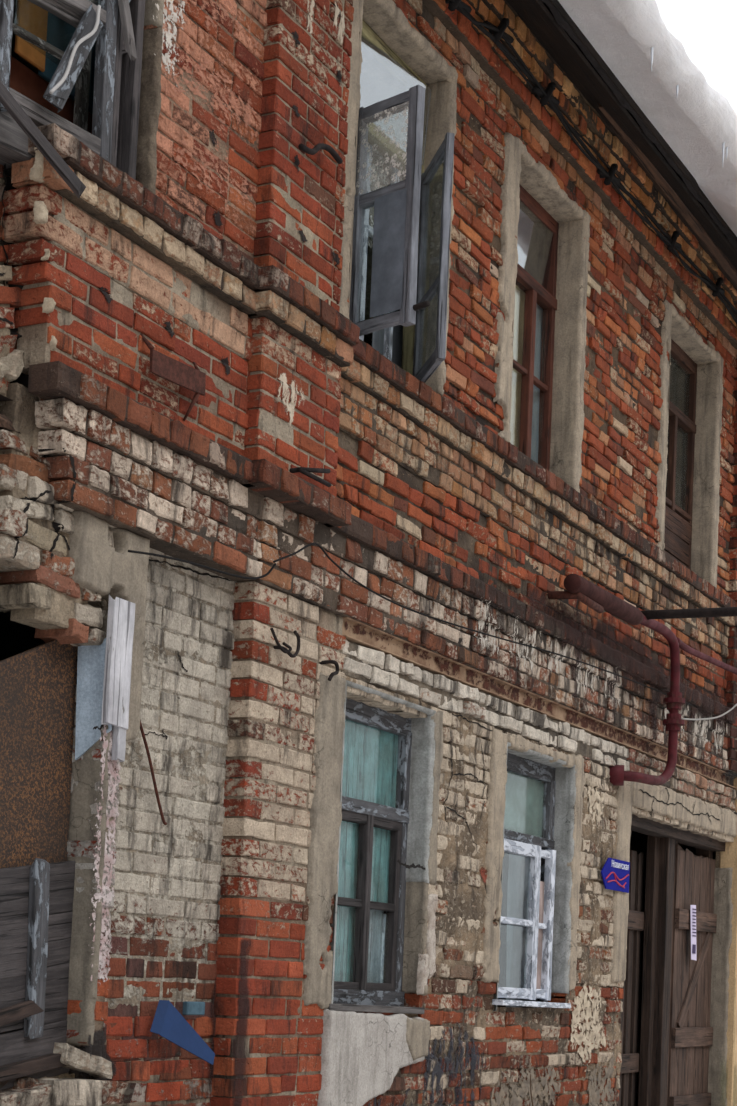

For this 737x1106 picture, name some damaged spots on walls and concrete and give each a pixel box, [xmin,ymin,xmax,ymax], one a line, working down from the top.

peeling [152,0,262,231]
peeling [90,724,121,983]
crack [640,787,720,825]
flaking render [317,1009,430,1106]